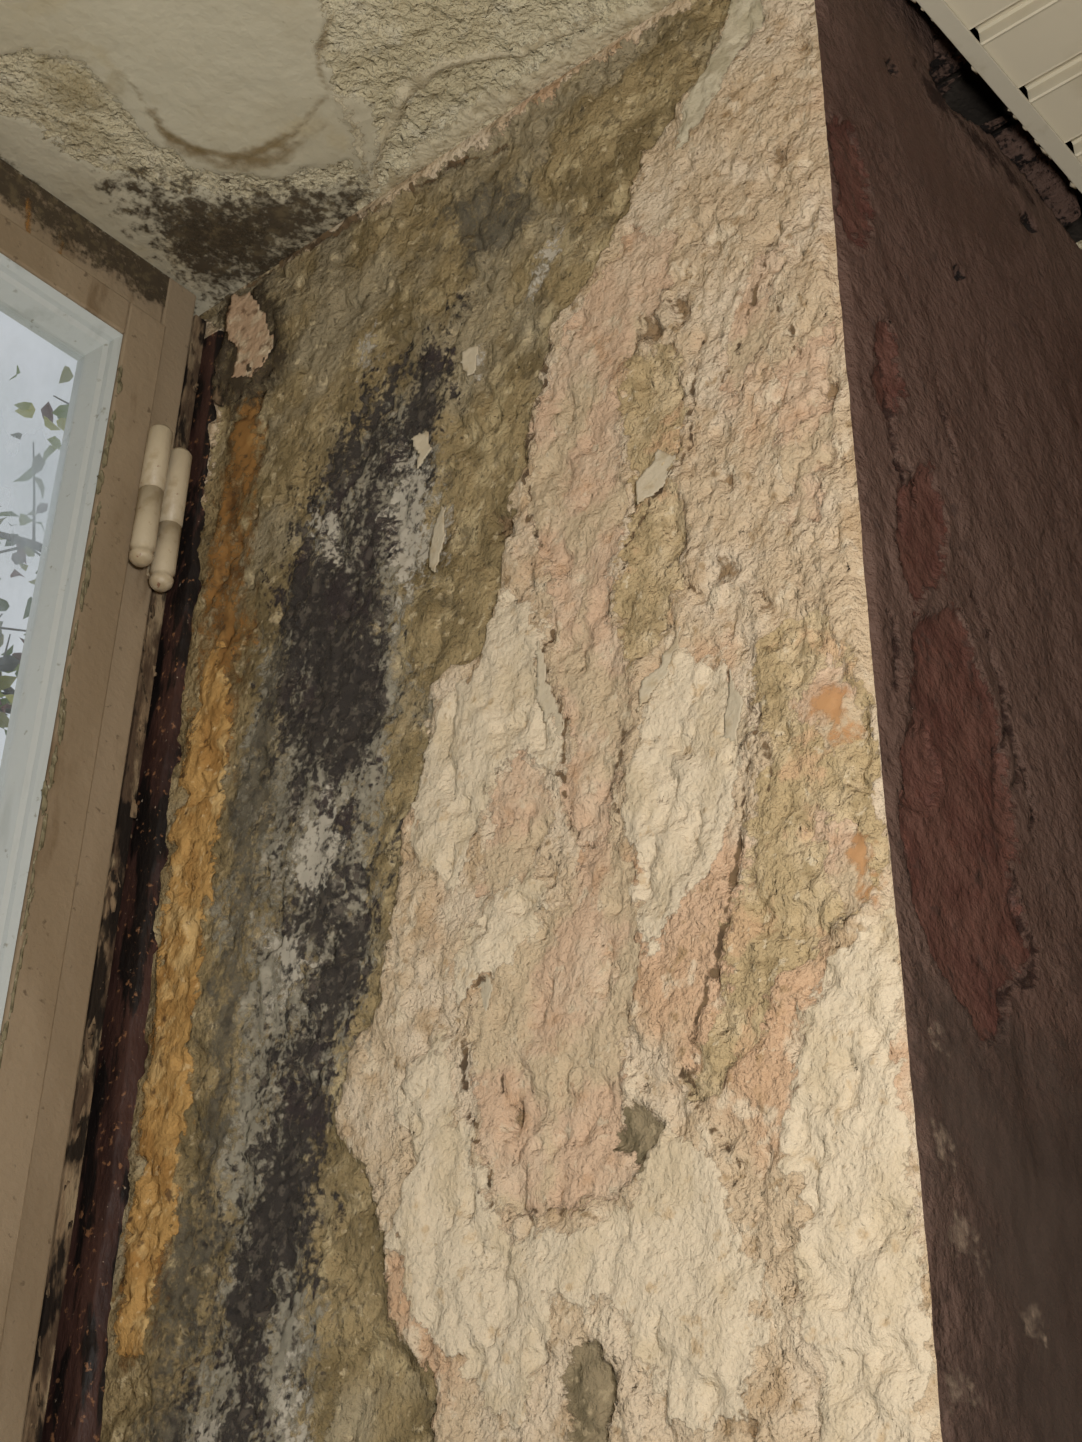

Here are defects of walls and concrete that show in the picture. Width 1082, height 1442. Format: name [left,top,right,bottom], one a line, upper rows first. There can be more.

leakage [0,157,370,421]
rust [192,391,268,763]
flaking render [0,0,648,217]
leakage [133,161,548,1442]
flaking render [100,0,890,1442]
leakage [525,228,564,300]
crack [542,629,595,849]
crack [625,237,802,551]
crack [679,697,772,1168]
peeling [895,460,1031,1042]
crack [459,1022,585,1216]
peeling [777,907,936,1442]